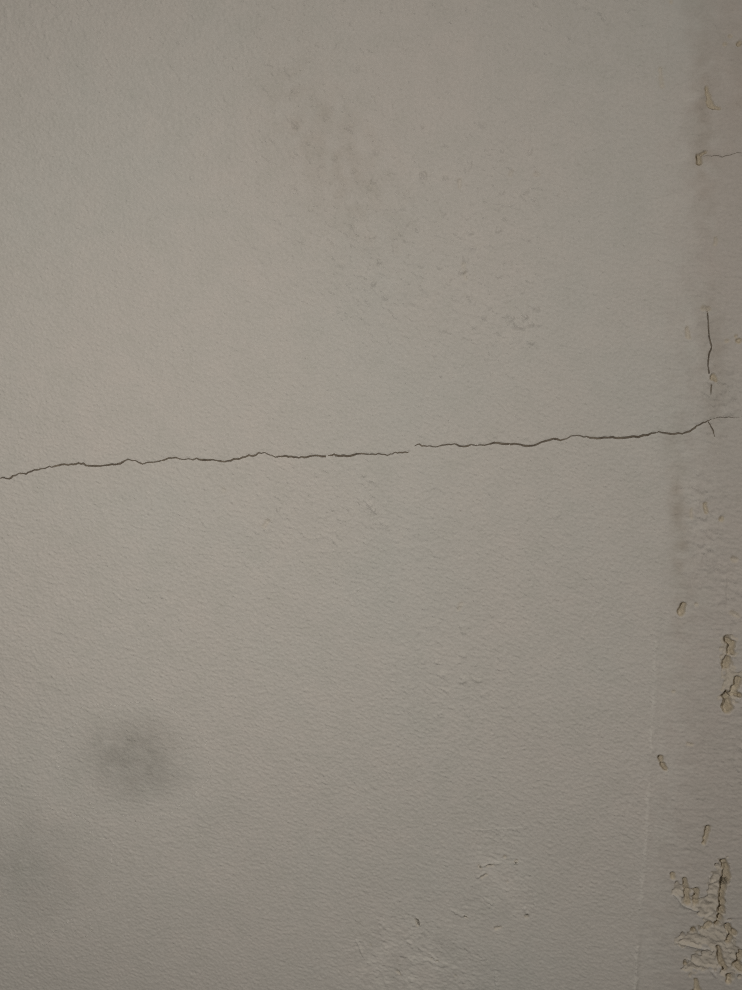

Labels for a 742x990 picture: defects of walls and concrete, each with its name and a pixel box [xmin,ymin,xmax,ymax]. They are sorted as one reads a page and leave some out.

crack [705,311,713,392]
crack [0,417,732,479]
spalling [717,634,742,715]
spalling [669,856,742,990]